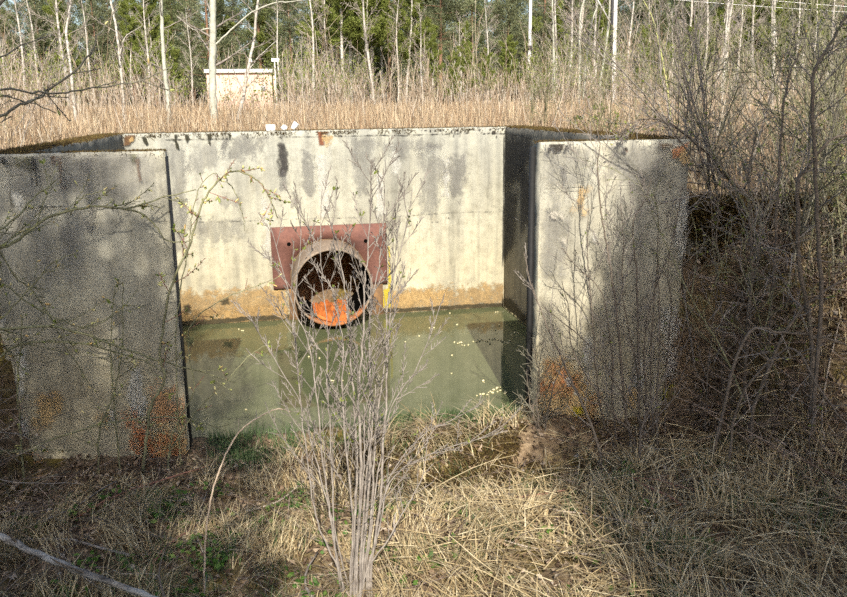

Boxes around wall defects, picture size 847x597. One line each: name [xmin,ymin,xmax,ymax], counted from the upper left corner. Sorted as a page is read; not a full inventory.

water stain [278,143,288,177]
corrosion [318,132,332,145]
water stain [502,134,530,266]
water stain [180,285,290,326]
corrosion [538,352,601,420]
corrosion [122,385,188,458]